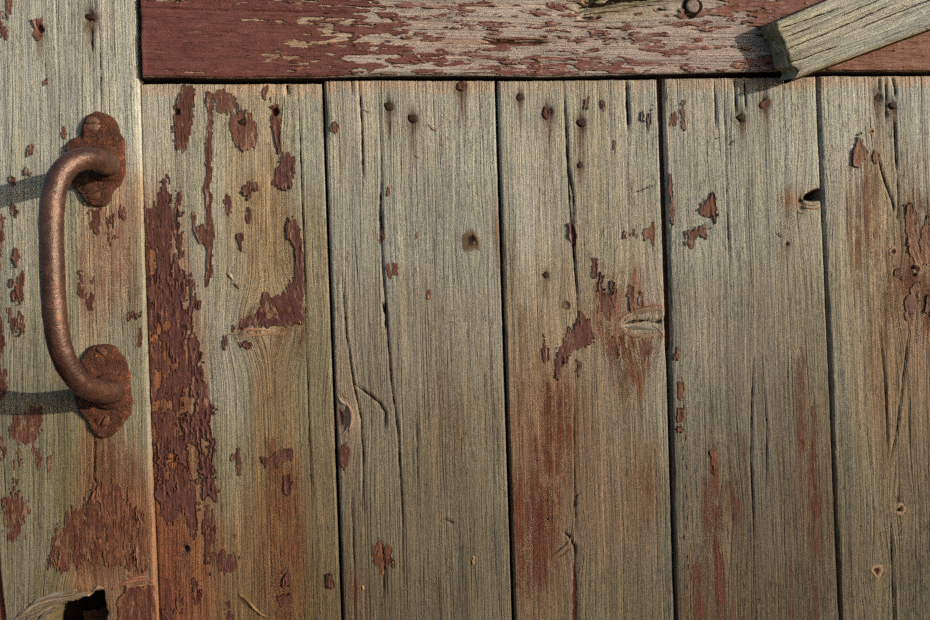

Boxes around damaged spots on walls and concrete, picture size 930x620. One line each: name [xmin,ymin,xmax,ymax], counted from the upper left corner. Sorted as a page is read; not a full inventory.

peeling [0,0,13,40]
peeling [30,16,44,41]
peeling [828,31,930,71]
peeling [9,144,34,187]
peeling [87,204,128,249]
peeling [903,202,930,267]
peeling [0,203,25,400]
peeling [77,269,95,311]
peeling [128,0,826,600]
crack [342,82,418,620]
peeling [0,402,54,543]
peeling [48,479,203,620]